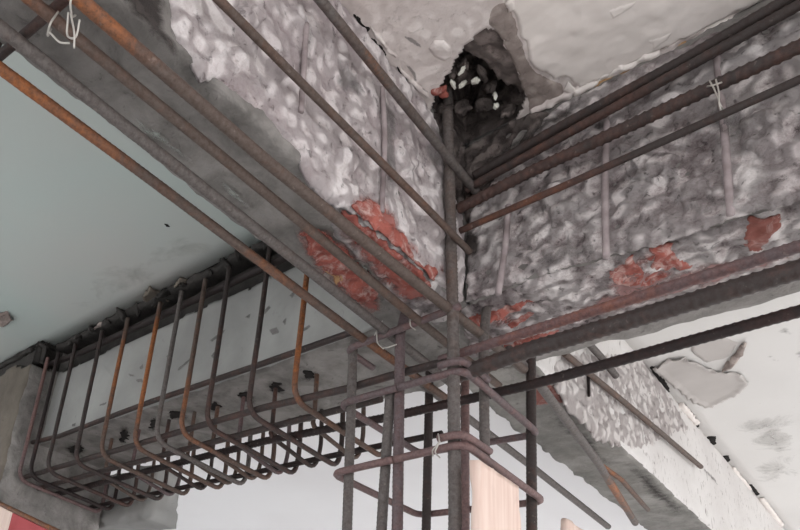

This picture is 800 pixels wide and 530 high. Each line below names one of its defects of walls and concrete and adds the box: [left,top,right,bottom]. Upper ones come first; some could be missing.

spalling [169,0,800,348]
spalling [56,241,278,354]
spalling [536,338,748,449]